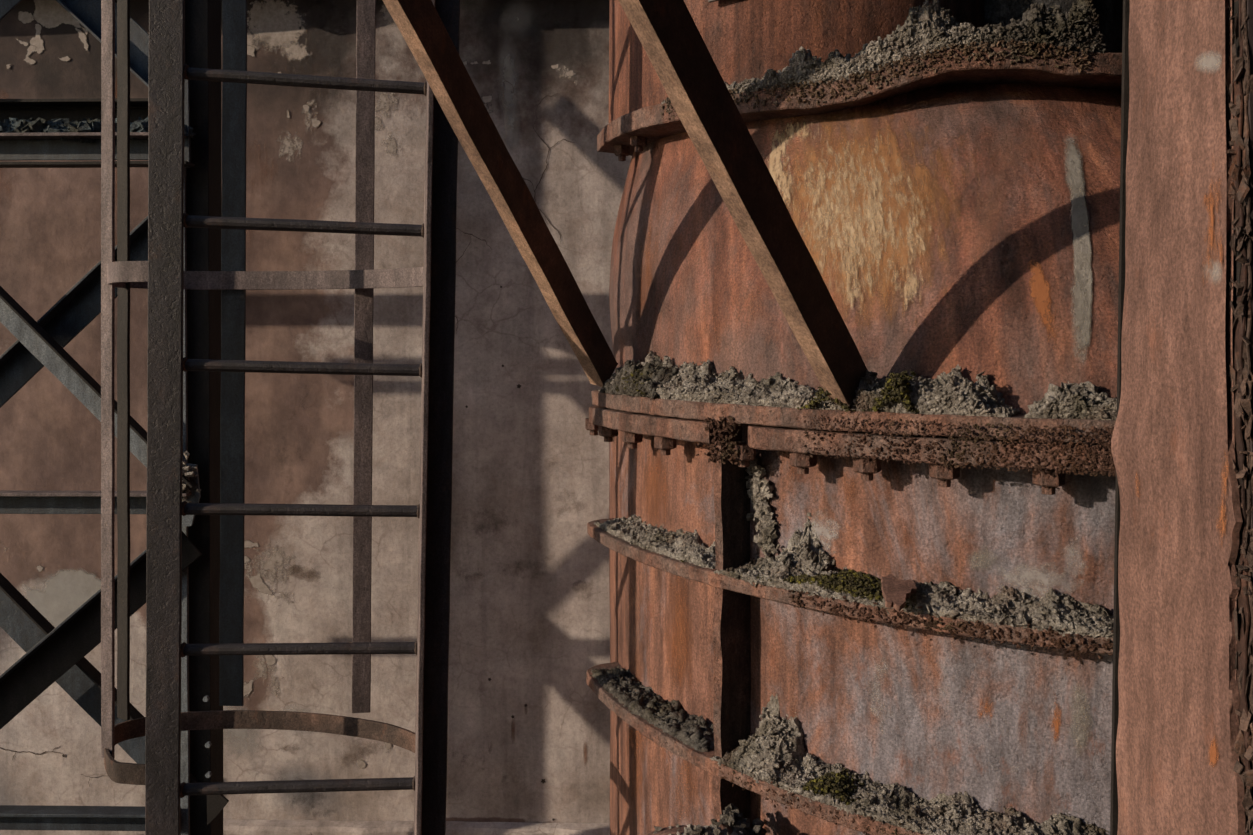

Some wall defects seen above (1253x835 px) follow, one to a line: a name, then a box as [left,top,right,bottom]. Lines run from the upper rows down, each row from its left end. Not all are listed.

peeling [6,0,89,69]
peeling [247,0,312,73]
peeling [279,100,321,161]
crack [523,93,570,243]
rust [1029,259,1054,340]